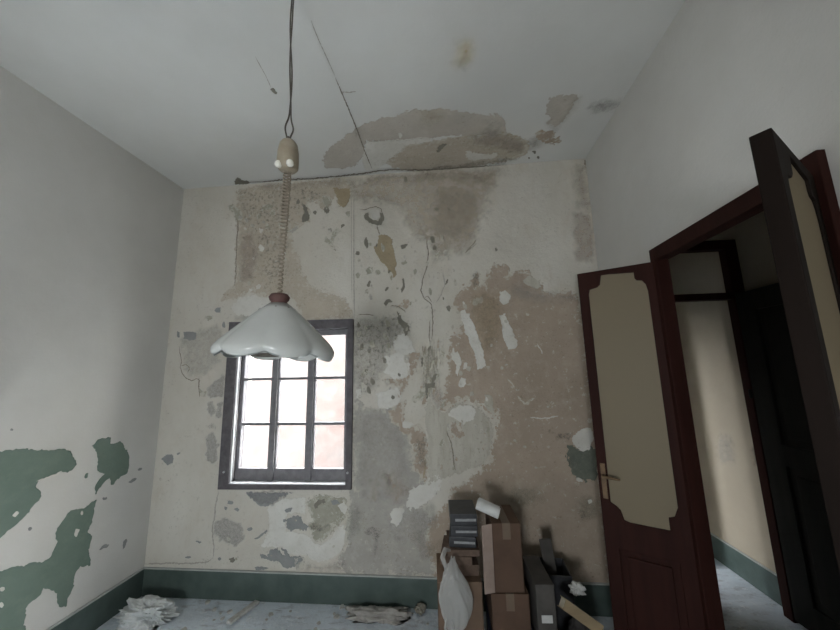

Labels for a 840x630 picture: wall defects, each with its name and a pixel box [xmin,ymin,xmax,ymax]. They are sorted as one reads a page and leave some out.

peeling [205,94,579,321]
crack [234,21,580,321]
crack [420,232,445,342]
peeling [0,437,142,630]
peeling [247,494,348,570]
spalling [376,262,609,583]